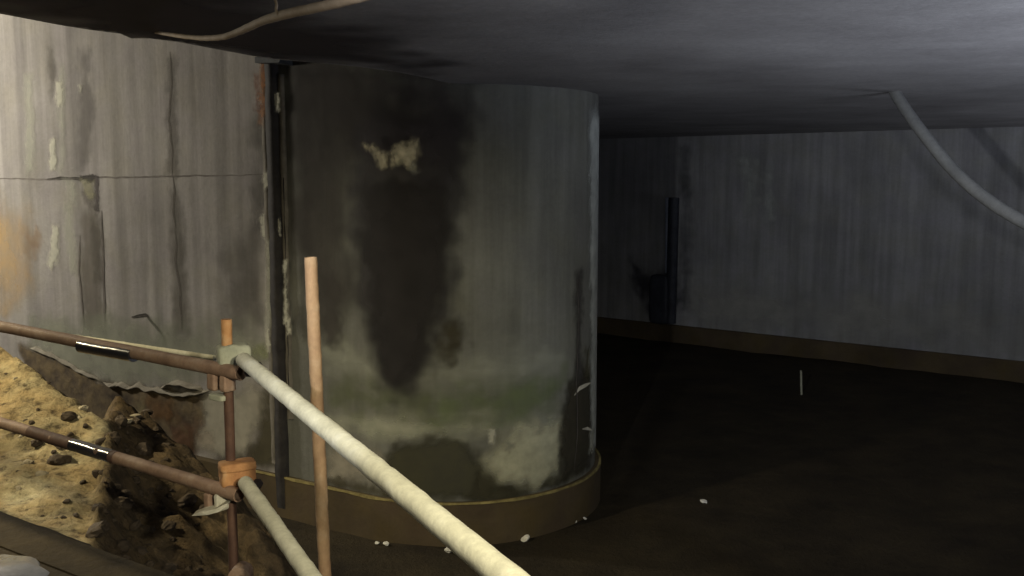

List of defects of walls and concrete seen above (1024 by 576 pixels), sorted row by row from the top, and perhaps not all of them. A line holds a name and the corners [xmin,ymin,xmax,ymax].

spalling [19,344,211,452]
crack [0,58,263,336]
water stain [11,0,465,391]
water stain [327,451,388,497]
spalling [364,138,418,169]
water stain [354,113,599,500]